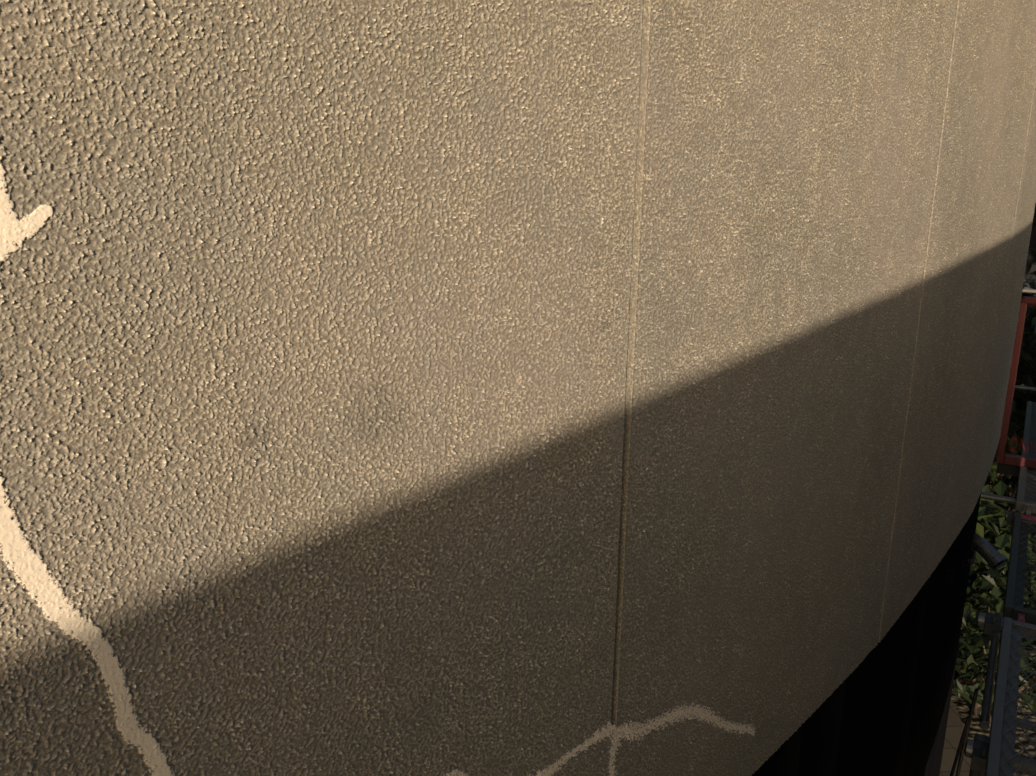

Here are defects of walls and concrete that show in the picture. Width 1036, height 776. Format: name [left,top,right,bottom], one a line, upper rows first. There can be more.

crack [0,156,53,263]
crack [0,469,175,776]
crack [439,768,469,776]
crack [528,701,755,776]